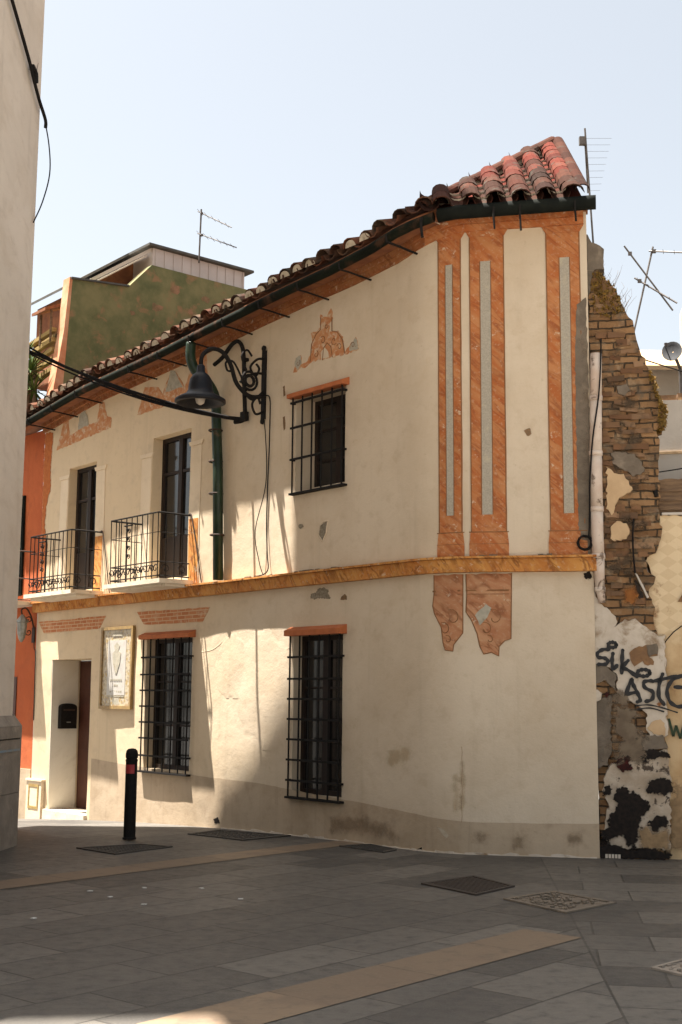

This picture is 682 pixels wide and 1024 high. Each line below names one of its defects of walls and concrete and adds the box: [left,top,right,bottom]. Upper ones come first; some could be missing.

spalling [318,521,328,542]
flaking render [605,452,645,542]
peeling [310,587,347,600]
flaking render [584,571,675,860]